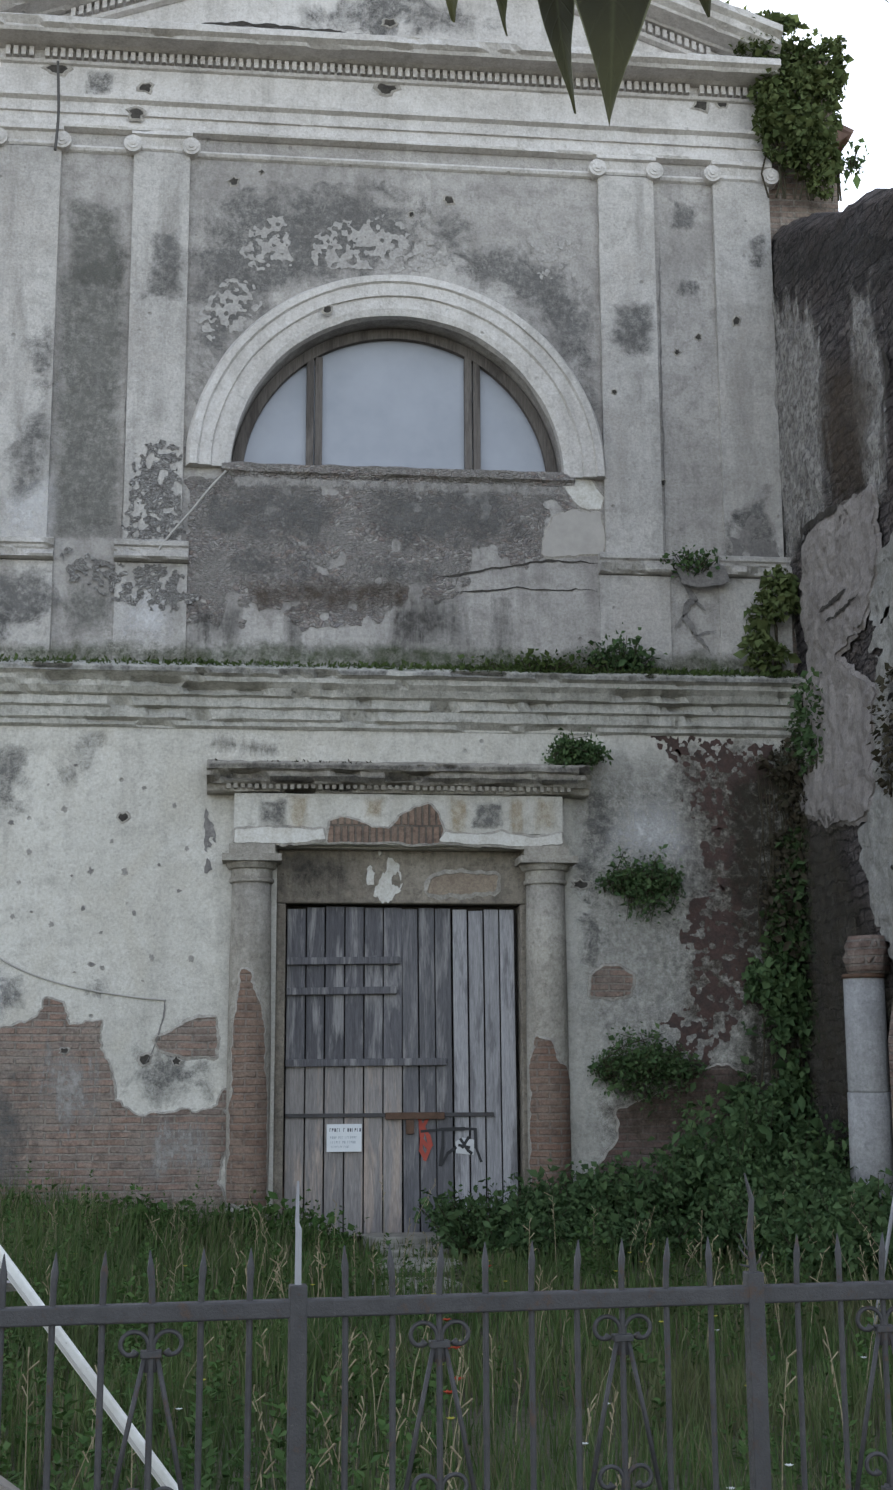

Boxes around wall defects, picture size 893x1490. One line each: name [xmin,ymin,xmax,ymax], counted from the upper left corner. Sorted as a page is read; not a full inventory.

spalling [0,967,268,1228]